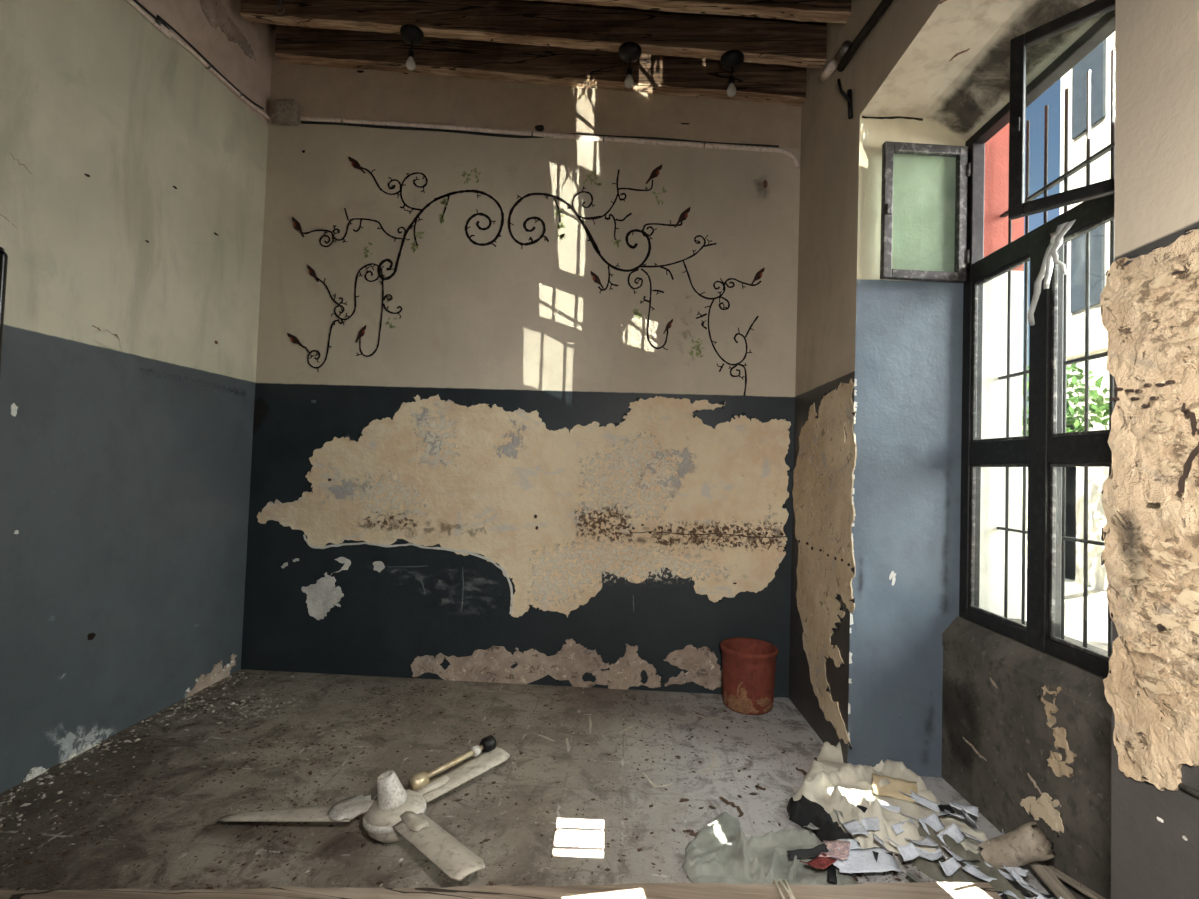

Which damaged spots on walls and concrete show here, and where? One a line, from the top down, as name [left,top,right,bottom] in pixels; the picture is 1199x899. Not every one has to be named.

peeling [1100,227,1199,791]
peeling [257,378,858,750]
flaking render [184,653,237,699]
peeling [1033,686,1077,777]
flaking render [1017,793,1064,838]